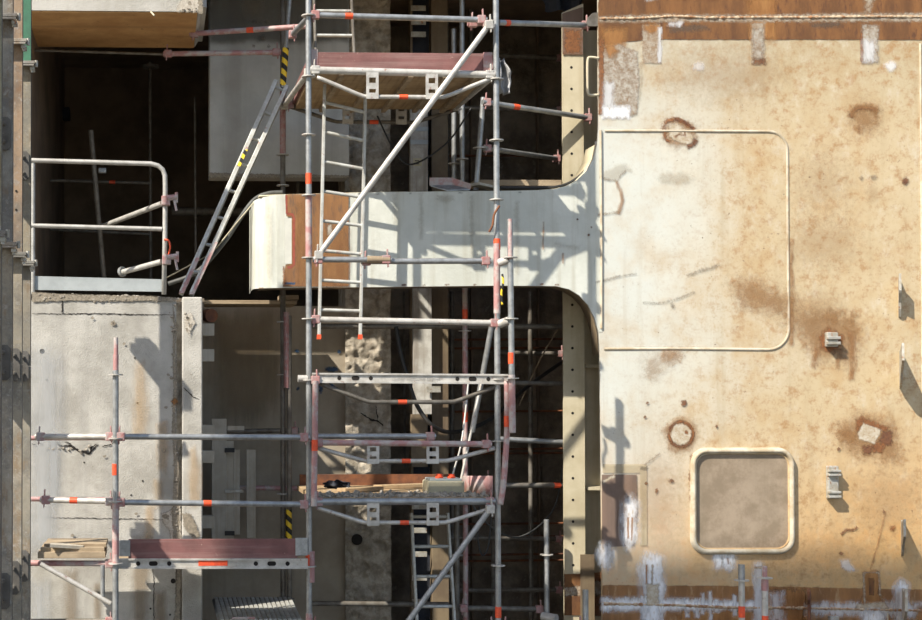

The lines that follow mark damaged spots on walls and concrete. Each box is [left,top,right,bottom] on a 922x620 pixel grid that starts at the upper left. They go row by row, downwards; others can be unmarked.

corrosion [598,0,922,115]
corrosion [662,117,698,149]
crack [32,442,113,454]
corrosion [667,420,695,461]
corrosion [856,416,893,455]